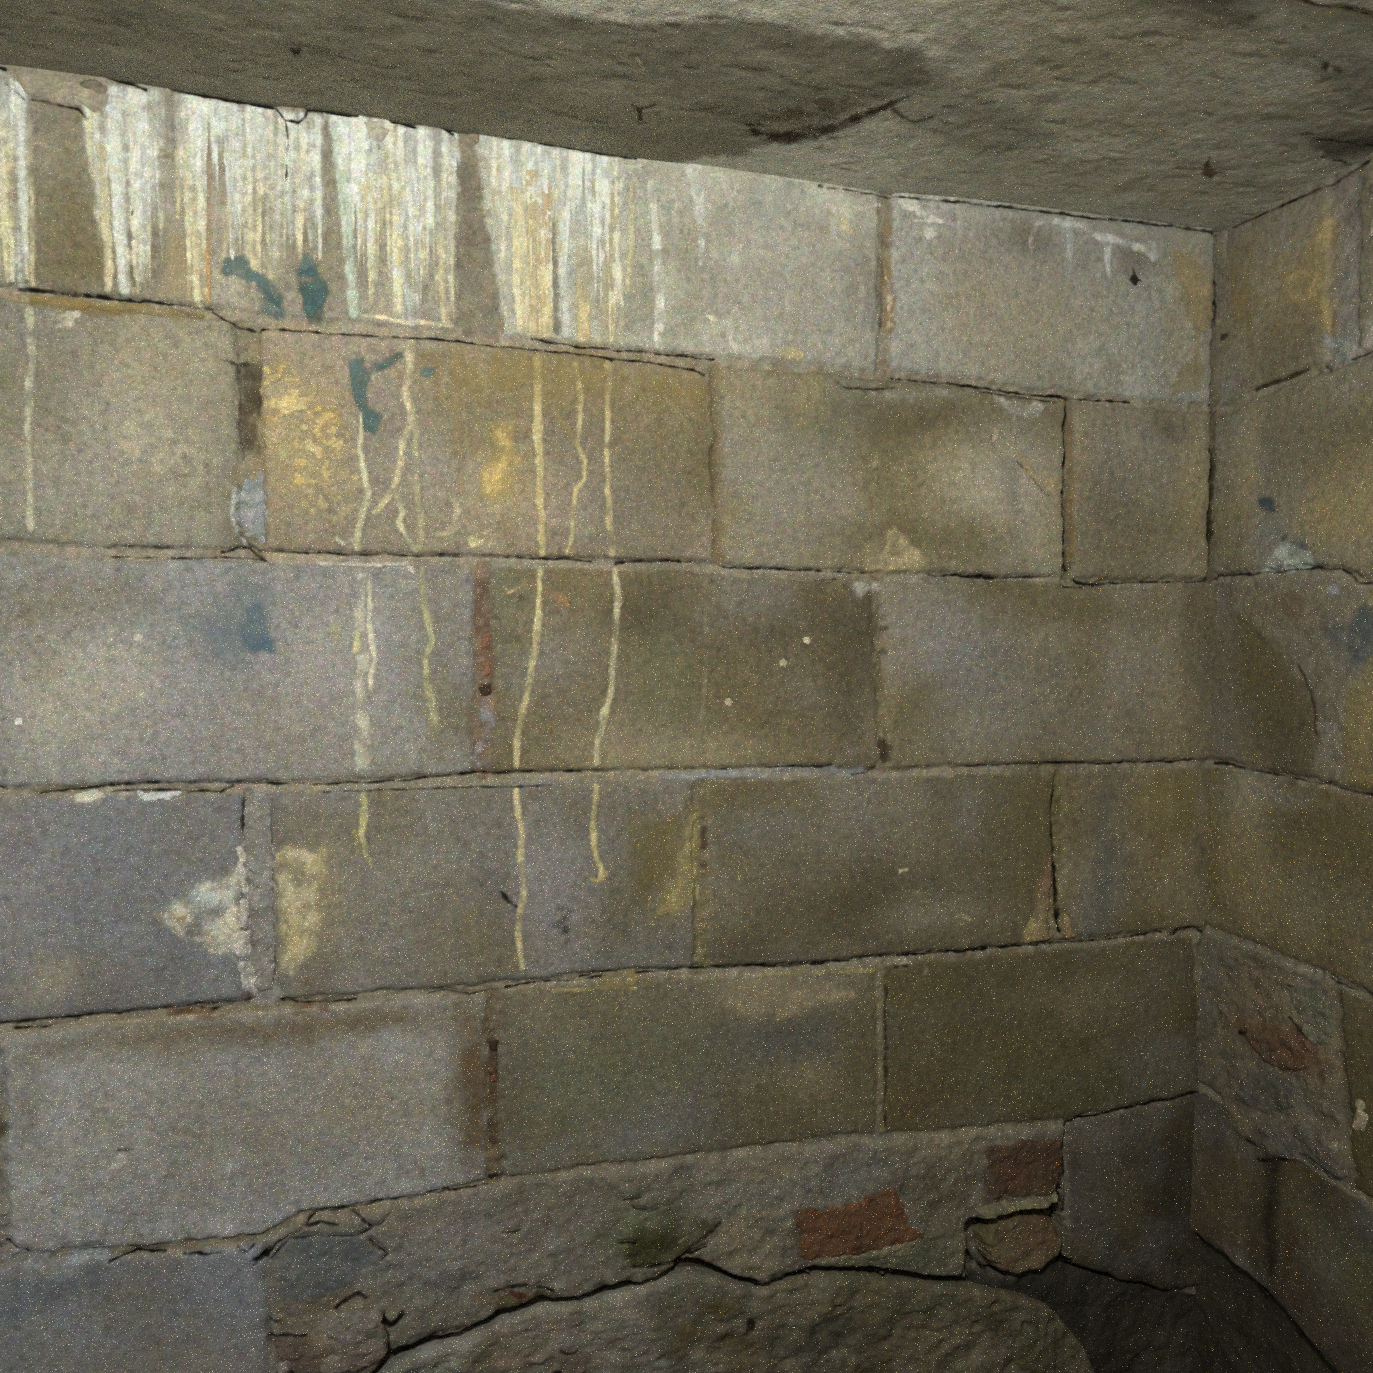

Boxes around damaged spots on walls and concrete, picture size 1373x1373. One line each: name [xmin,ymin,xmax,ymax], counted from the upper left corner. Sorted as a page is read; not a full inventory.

water stain [735,172,964,296]
water stain [0,0,928,772]
water stain [162,866,242,955]
water stain [274,818,328,975]
water stain [352,793,371,864]
water stain [513,785,527,970]
water stain [590,784,608,882]
water stain [637,806,699,916]
water stain [662,766,791,782]
crack [636,759,1373,973]
crack [0,997,368,1035]
crack [425,974,602,1003]